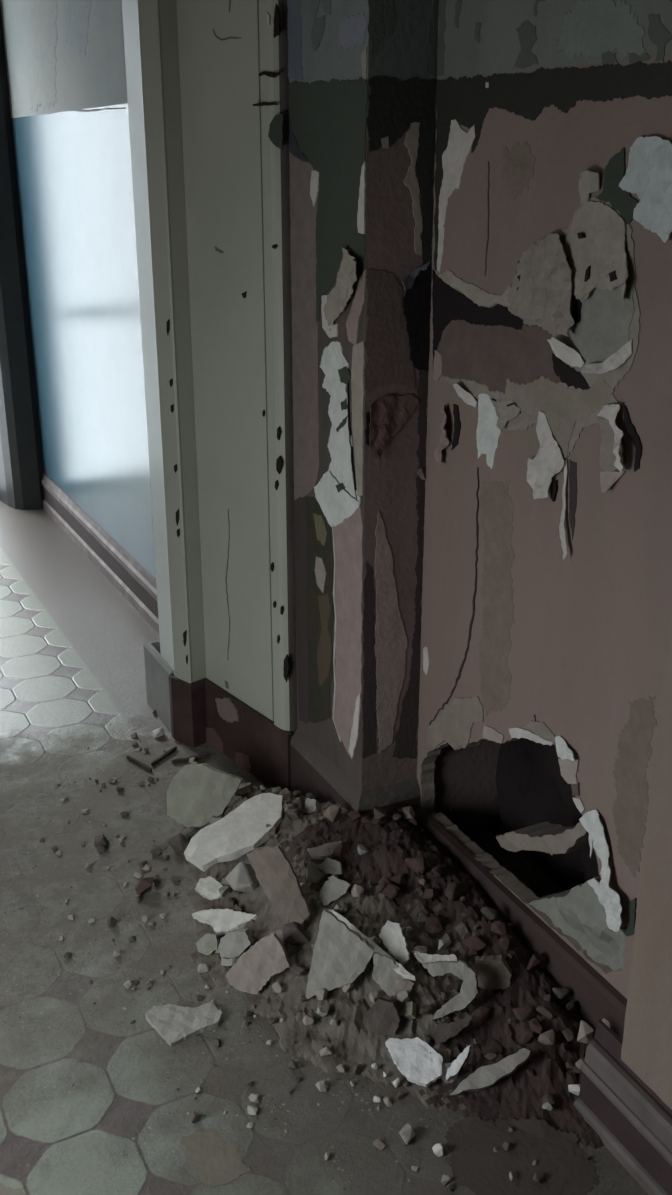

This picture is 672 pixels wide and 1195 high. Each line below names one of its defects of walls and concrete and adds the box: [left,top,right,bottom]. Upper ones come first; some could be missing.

crack [213,0,242,41]
spalling [310,170,319,207]
spalling [357,162,366,234]
peeling [363,136,672,460]
flaking render [303,341,361,723]
peeling [277,635,290,682]
crack [429,467,480,725]
spalling [427,696,586,836]
spalling [519,846,625,971]